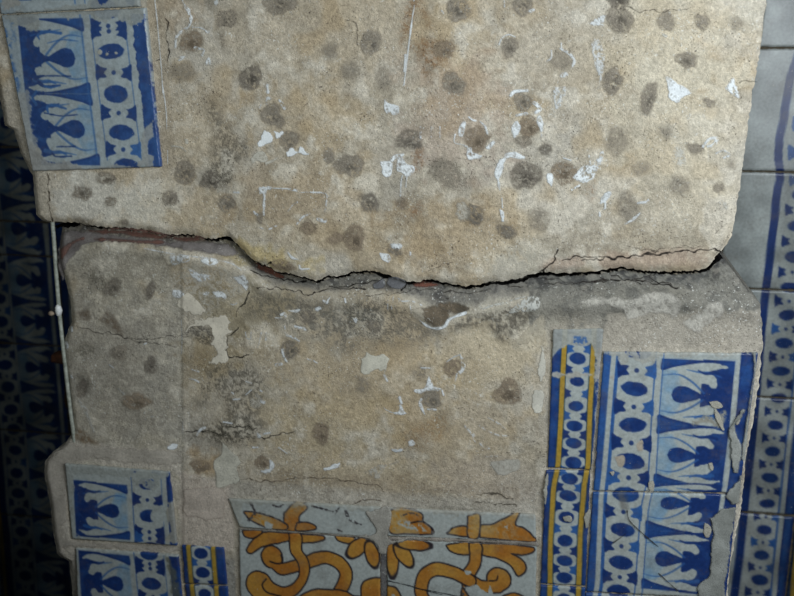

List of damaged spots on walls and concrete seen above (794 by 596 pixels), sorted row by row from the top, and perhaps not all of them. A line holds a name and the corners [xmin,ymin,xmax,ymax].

spalling [58,220,248,367]
crack [47,174,723,307]
crack [186,426,291,440]